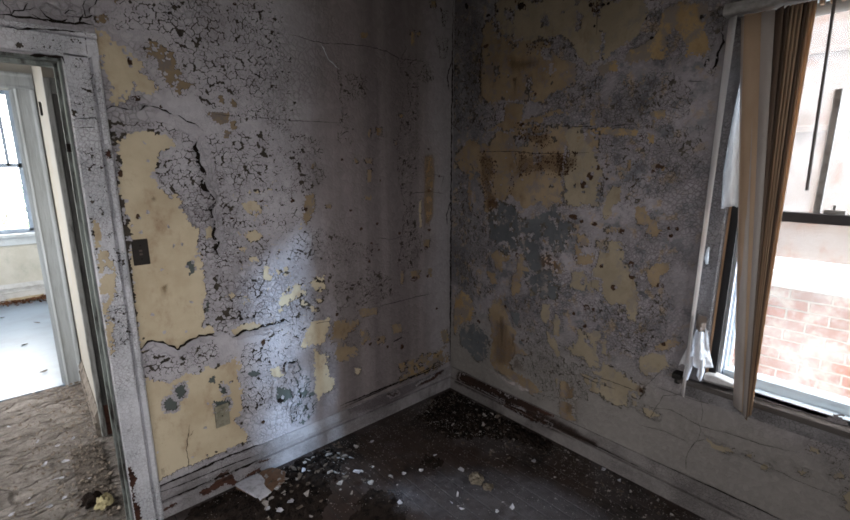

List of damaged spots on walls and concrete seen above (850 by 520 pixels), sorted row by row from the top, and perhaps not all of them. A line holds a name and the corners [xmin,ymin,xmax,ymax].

peeling [486,0,655,77]
damp [509,122,578,195]
peeling [15,0,389,483]
peeling [453,117,707,428]
peeling [196,441,374,520]
crack [488,371,833,518]